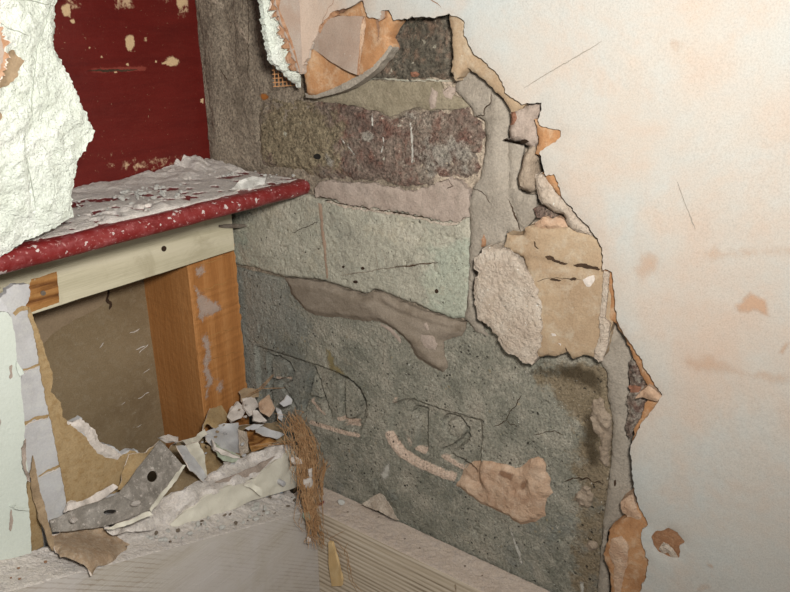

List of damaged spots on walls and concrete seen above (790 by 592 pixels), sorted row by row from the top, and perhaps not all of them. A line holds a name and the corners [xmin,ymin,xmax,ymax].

flaking render [276,0,406,98]
flaking render [449,14,528,112]
crack [526,42,600,87]
flaking render [534,118,561,156]
flaking render [543,172,562,197]
flaking render [474,223,656,387]
flaking render [632,399,659,441]
flaking render [303,468,313,488]
flaking render [362,493,399,520]
flaking render [604,488,649,592]
flaking render [652,528,685,558]